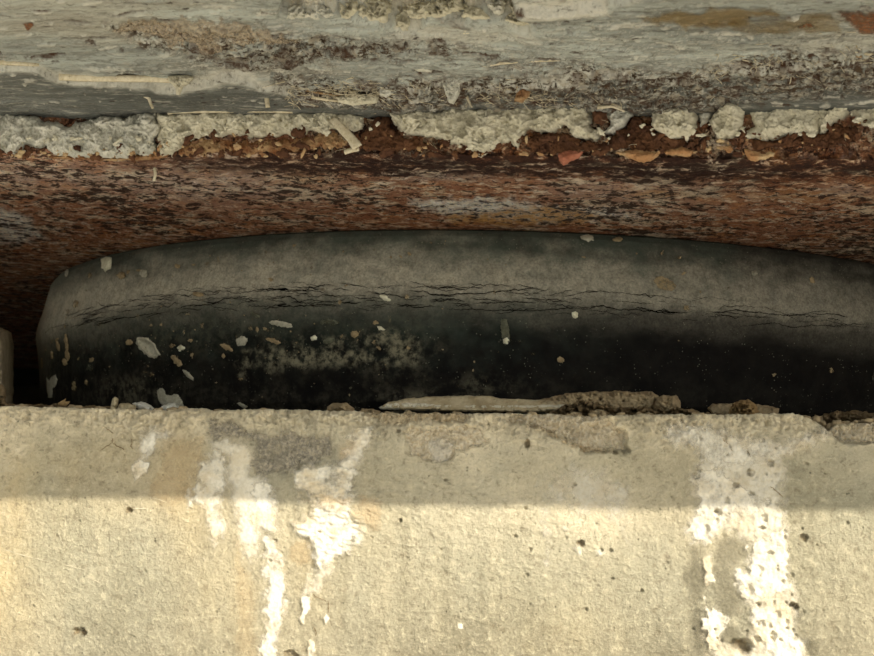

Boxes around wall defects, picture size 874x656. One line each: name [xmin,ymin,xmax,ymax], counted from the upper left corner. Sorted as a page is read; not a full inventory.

spalling [286,0,529,31]
rust [592,111,608,126]
rust [558,150,583,166]
rust [616,147,694,163]
rust [744,148,775,162]
crack [46,281,874,332]
damp [131,430,169,480]
damp [189,439,288,656]
damp [293,427,373,624]
damp [668,426,826,656]